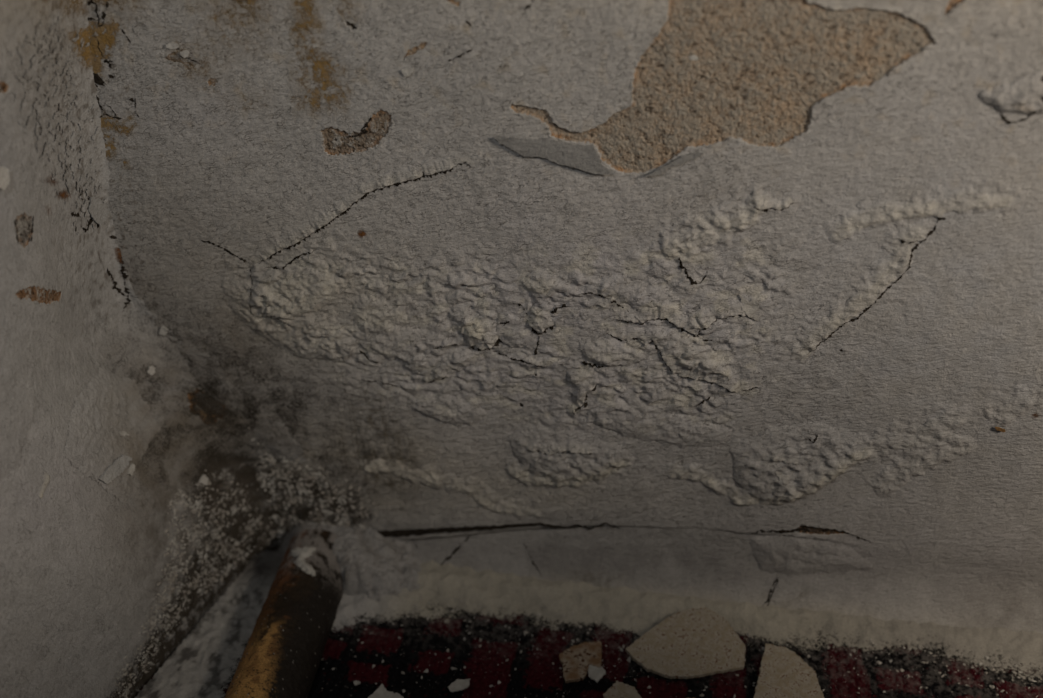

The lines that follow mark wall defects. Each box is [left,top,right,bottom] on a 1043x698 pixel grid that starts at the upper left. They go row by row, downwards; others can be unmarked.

spalling [942,0,967,17]
spalling [319,108,394,158]
spalling [494,0,939,177]
spalling [1000,98,1043,124]
crack [201,151,481,315]
crack [678,257,707,285]
crack [809,217,946,353]
crack [422,292,764,405]
crack [566,361,604,415]
damp [110,332,412,698]
crack [362,522,619,577]
crack [752,525,870,542]